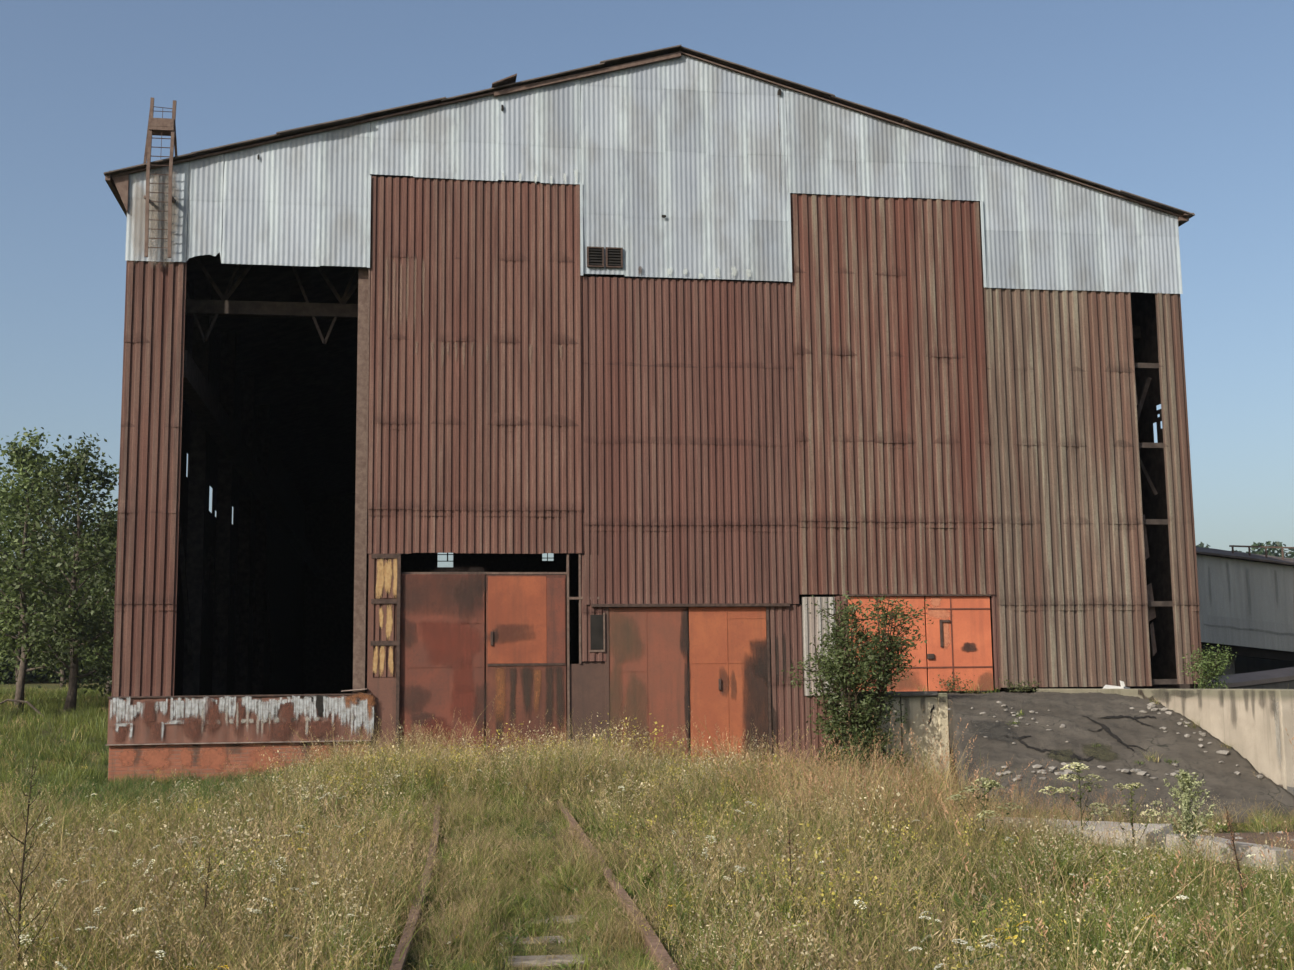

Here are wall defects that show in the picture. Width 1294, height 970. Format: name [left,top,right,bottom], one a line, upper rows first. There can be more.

rust [962,643,976,652]
rust [142,698,245,739]
peeling [110,696,374,772]
rust [268,702,337,740]
rust [346,694,374,718]
crack [1004,715,1156,761]